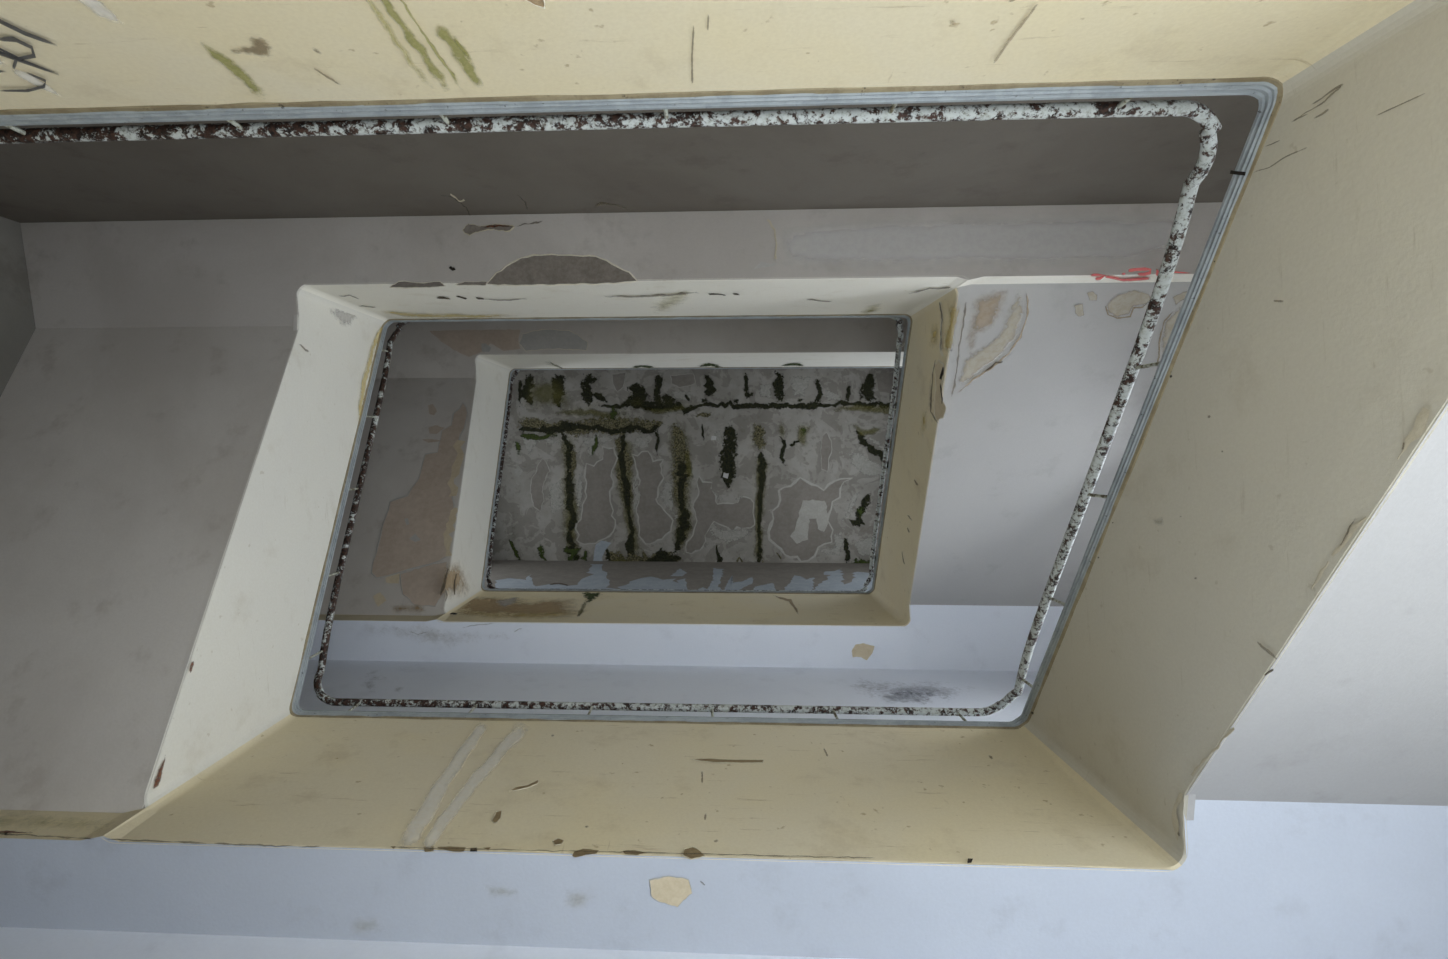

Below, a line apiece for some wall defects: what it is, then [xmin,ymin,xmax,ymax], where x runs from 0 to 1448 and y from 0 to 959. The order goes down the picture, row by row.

damp [400,0,456,81]
spalling [389,254,637,289]
spalling [391,838,783,860]
peeling [649,876,705,907]